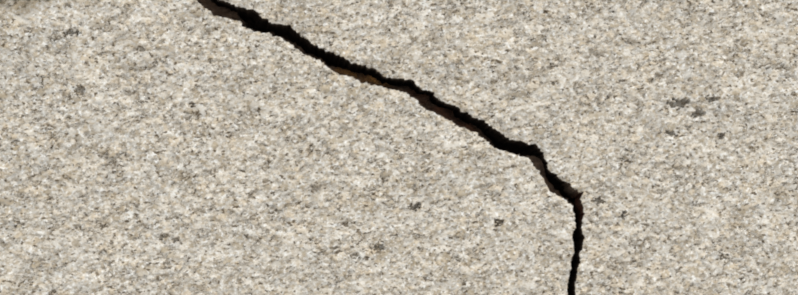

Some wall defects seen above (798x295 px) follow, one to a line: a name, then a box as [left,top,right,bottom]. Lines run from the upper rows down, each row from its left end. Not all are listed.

crack [197,0,585,295]